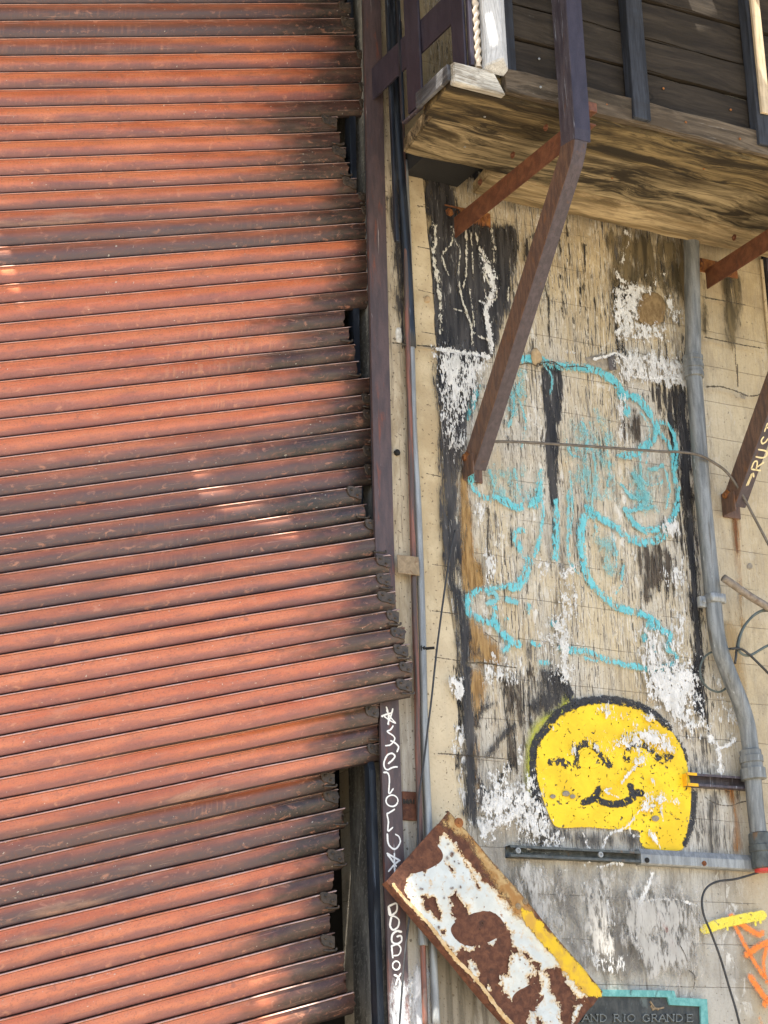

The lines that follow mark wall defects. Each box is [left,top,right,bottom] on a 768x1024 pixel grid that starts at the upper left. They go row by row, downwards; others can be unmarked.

peeling [637,292,666,325]
corrosion [382,811,602,1024]